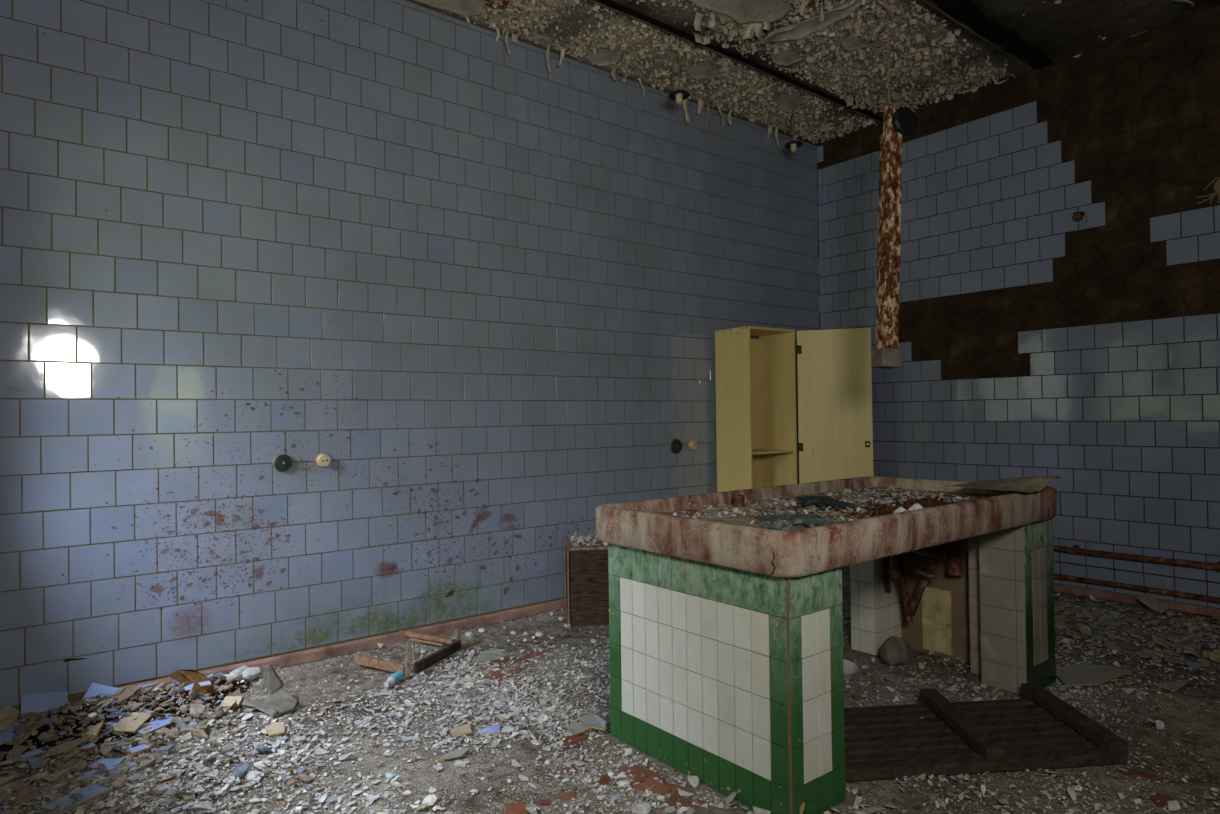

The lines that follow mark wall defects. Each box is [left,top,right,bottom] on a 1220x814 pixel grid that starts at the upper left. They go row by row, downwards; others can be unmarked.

peeling [414,0,1220,380]